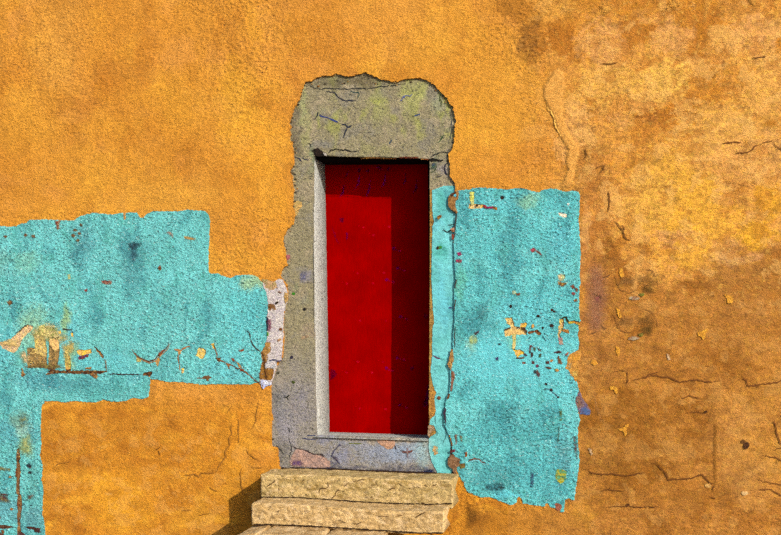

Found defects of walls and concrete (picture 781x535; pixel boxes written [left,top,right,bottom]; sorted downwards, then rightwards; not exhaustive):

spalling [302,73,453,111]
crack [722,140,781,154]
peeling [0,323,107,379]
crack [110,343,190,375]
crack [210,331,281,383]
flaking render [259,279,295,389]
peeling [498,305,581,381]
peeling [428,349,455,436]
crack [614,370,720,414]
crack [763,422,781,461]
peeling [0,448,41,535]
crack [588,463,716,508]